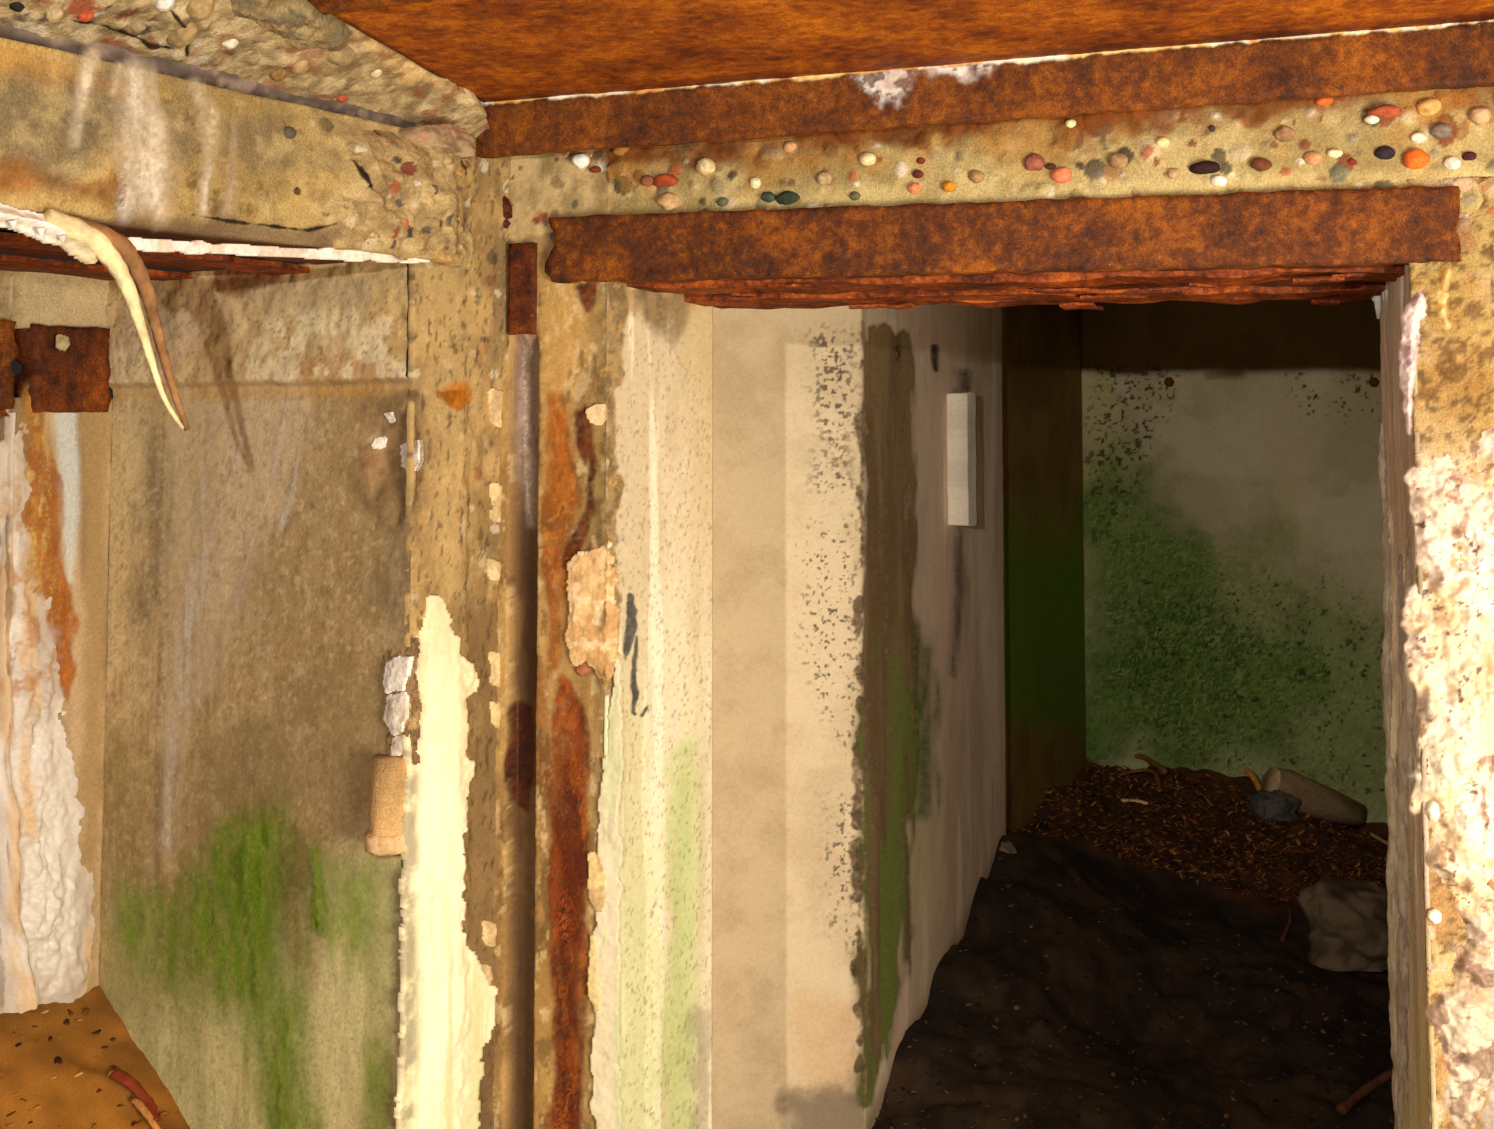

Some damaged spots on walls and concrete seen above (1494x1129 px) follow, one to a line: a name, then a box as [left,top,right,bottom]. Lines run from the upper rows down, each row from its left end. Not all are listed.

leakage [75,51,99,138]
leakage [112,66,169,215]
leakage [199,99,219,217]
leakage [0,203,430,431]
rust [577,284,595,310]
rust [1033,283,1217,310]
peeling [487,388,503,427]
rust [21,391,78,698]
peeling [486,559,502,581]
peeling [489,483,502,522]
rust [543,395,595,1129]
peeling [394,595,501,1129]